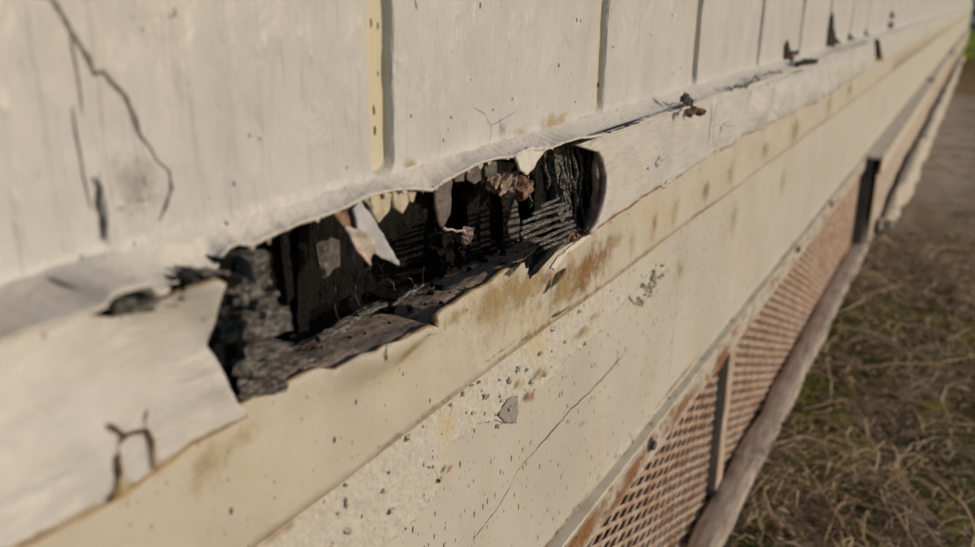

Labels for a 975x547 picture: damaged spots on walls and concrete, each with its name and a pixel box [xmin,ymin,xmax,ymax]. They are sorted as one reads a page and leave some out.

crack [52,0,174,221]
spalling [247,237,278,304]
spalling [309,175,460,310]
spalling [498,157,531,180]
spalling [515,141,593,270]
rust [597,185,663,230]
spalling [255,257,671,547]
crack [473,348,628,540]